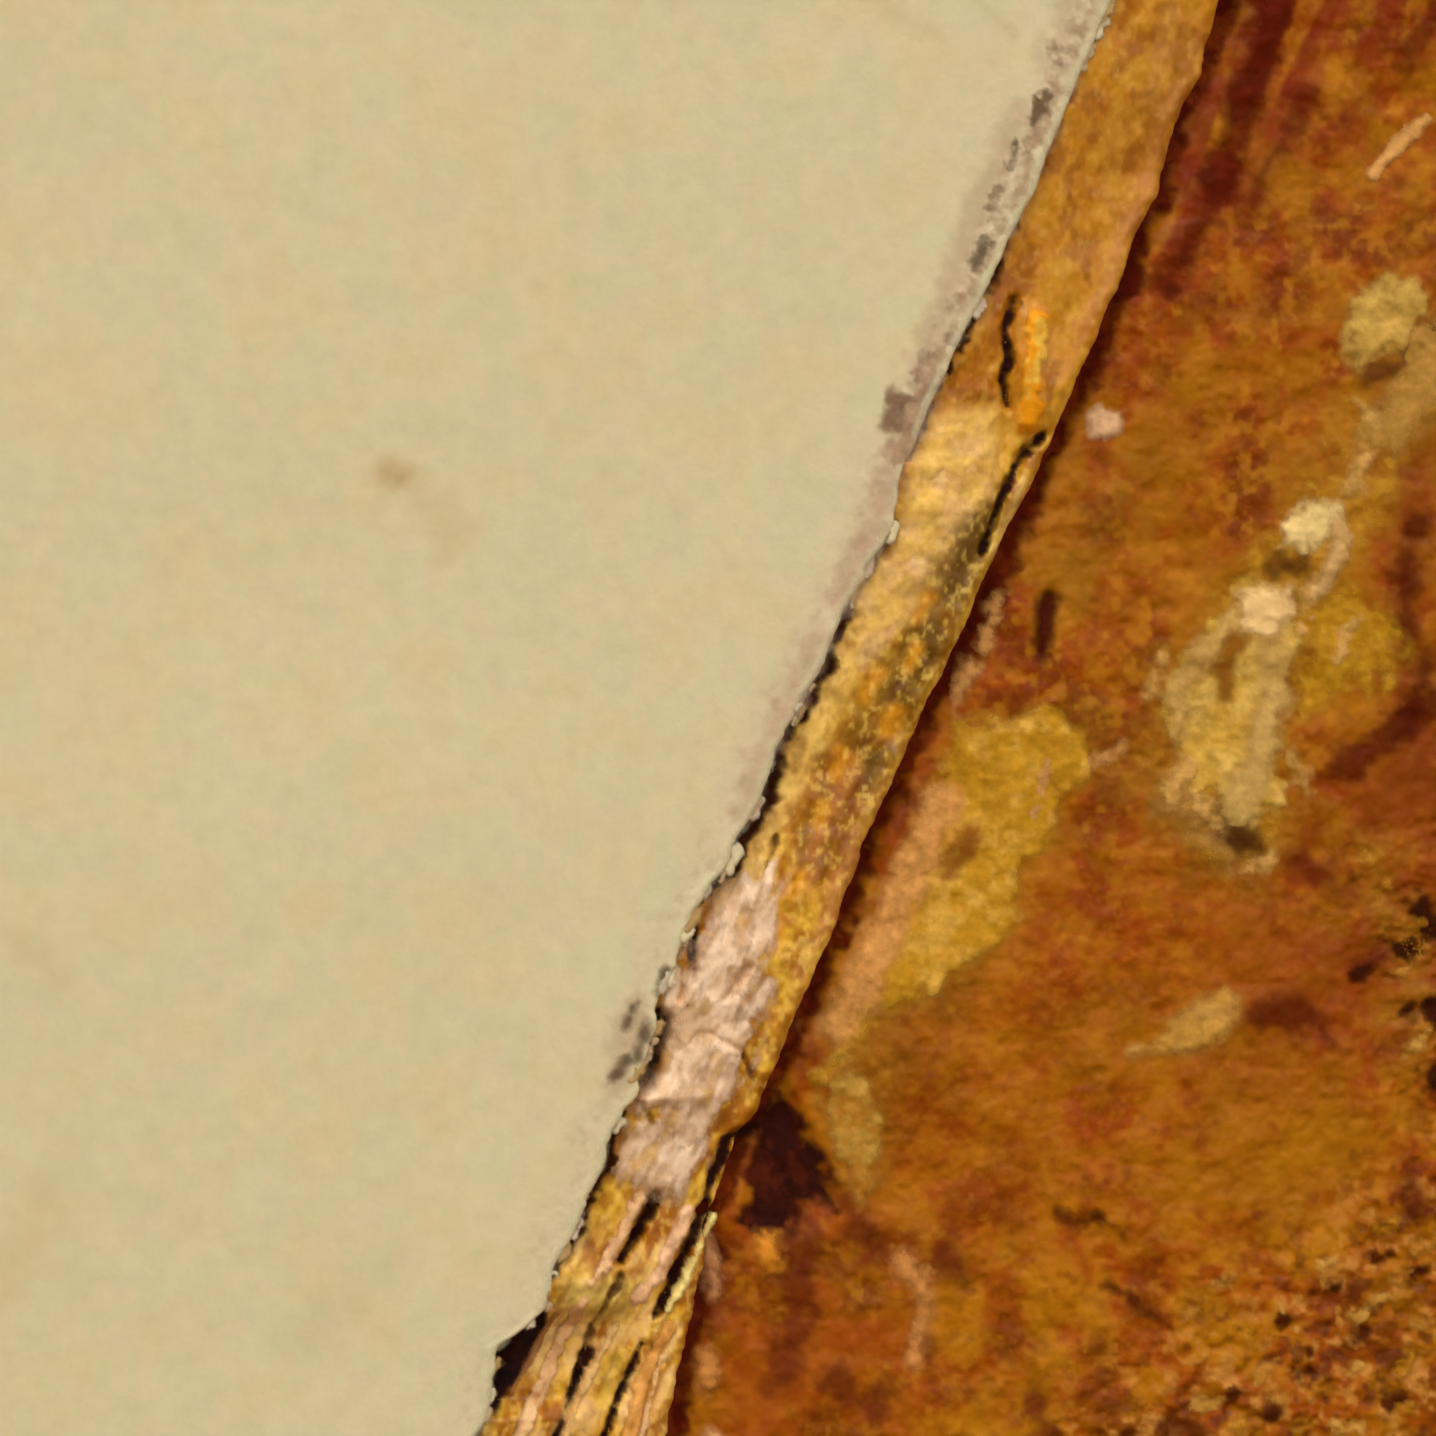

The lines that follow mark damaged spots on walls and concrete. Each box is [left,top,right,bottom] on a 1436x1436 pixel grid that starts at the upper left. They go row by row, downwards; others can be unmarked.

corrosion [1157,0,1291,297]
peeling [1367,114,1432,180]
spalling [480,0,1218,1436]
crack [600,0,1240,1436]
peeling [810,274,1436,1202]
crack [551,1008,666,1279]
crack [552,1194,660,1436]
corrosion [1191,1359,1285,1430]
corrosion [1275,1306,1292,1326]
corrosion [1295,1420,1365,1436]
corrosion [1351,1242,1436,1344]
corrosion [1381,1351,1415,1421]